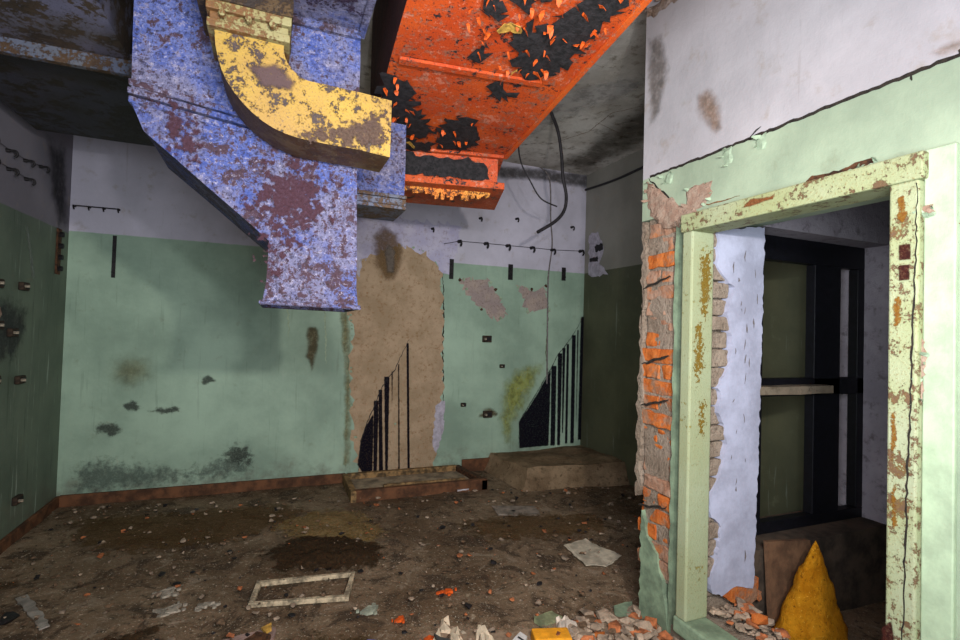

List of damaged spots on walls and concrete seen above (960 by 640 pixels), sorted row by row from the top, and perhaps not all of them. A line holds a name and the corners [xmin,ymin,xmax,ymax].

rust [149,98,205,171]
rust [249,64,293,89]
rust [284,111,390,148]
water stain [700,96,719,128]
crack [649,49,960,198]
peeling [806,157,878,182]
rust [234,149,344,283]
peeling [588,232,608,277]
peeling [347,243,445,472]
water stain [519,316,584,446]
flaking render [635,170,713,633]
water stain [226,447,250,464]